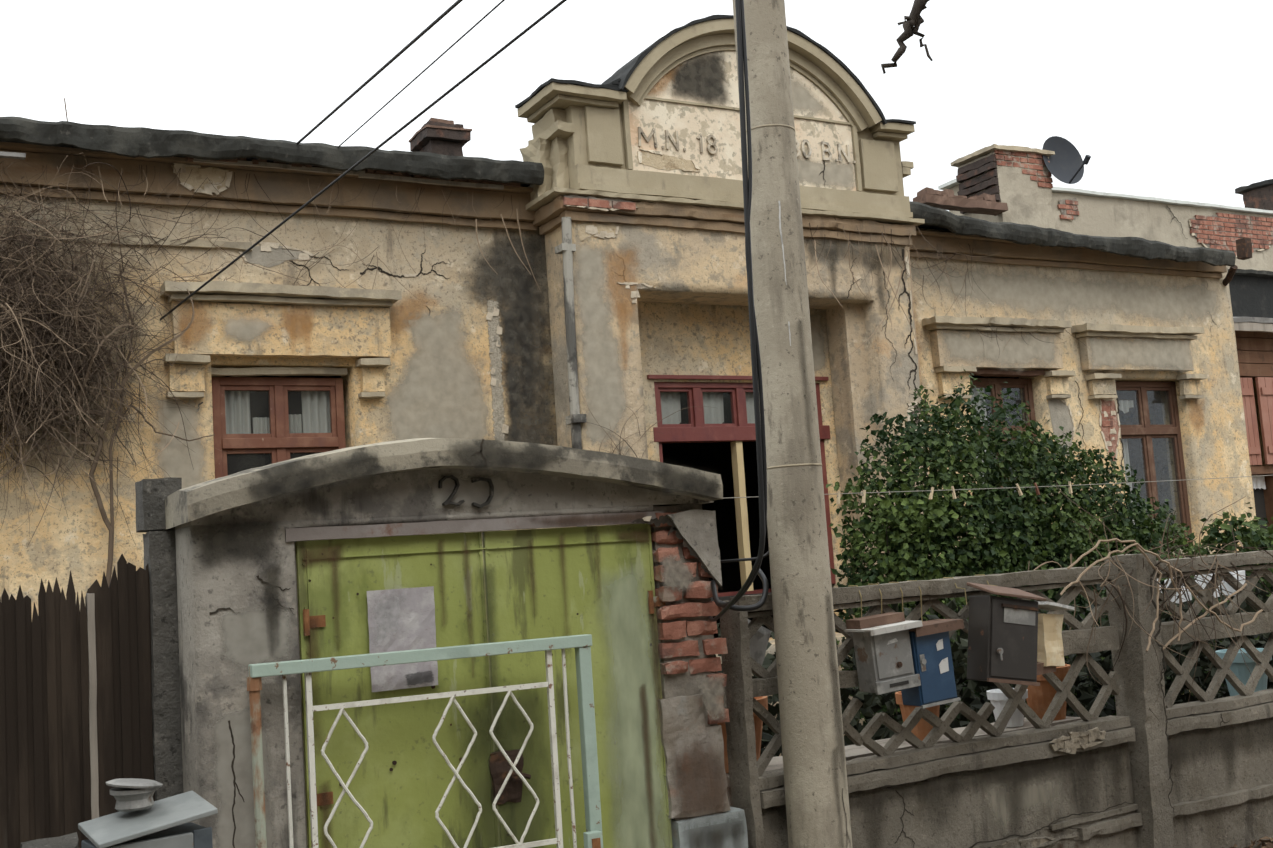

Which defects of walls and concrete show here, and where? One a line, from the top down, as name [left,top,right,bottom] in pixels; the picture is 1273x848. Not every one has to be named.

flaking render [1057,198,1080,221]
flaking render [1189,213,1273,257]
crack [291,252,451,286]
flaking render [1099,398,1121,465]
peeling [667,510,722,586]
leakage [482,569,498,729]
spalling [1049,727,1106,754]
crack [228,720,244,848]
crack [895,790,915,847]
crack [969,802,1133,848]